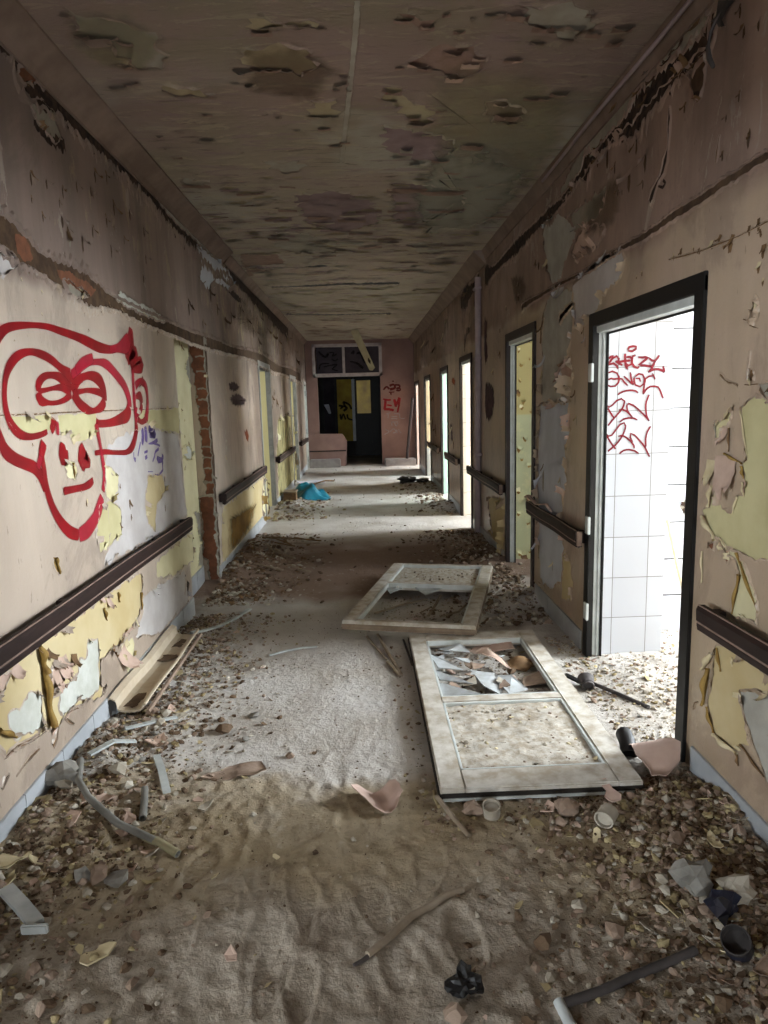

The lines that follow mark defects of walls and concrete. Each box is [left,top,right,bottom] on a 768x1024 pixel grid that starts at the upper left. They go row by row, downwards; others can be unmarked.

peeling [229,13,327,88]
peeling [393,0,636,83]
flaking render [17,60,63,145]
peeling [304,76,351,121]
peeling [374,84,456,137]
peeling [179,176,509,339]
peeling [480,9,768,627]
peeling [0,168,302,762]
peeling [699,643,768,785]